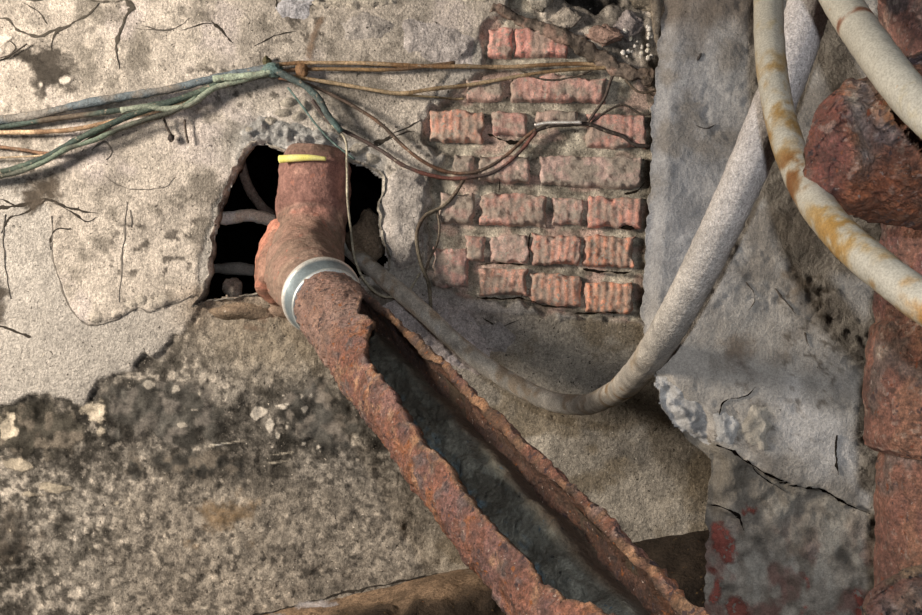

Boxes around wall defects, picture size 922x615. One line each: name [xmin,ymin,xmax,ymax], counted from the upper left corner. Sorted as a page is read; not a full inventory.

crack [0,0,233,69]
spalling [487,27,568,60]
crack [0,198,96,250]
crack [91,141,170,292]
spalling [51,97,339,326]
spalling [344,143,391,282]
spalling [429,73,647,315]
leakage [0,401,84,471]
leakage [23,482,72,497]
leakage [101,377,243,480]
leakage [251,377,363,453]
crack [716,435,870,514]